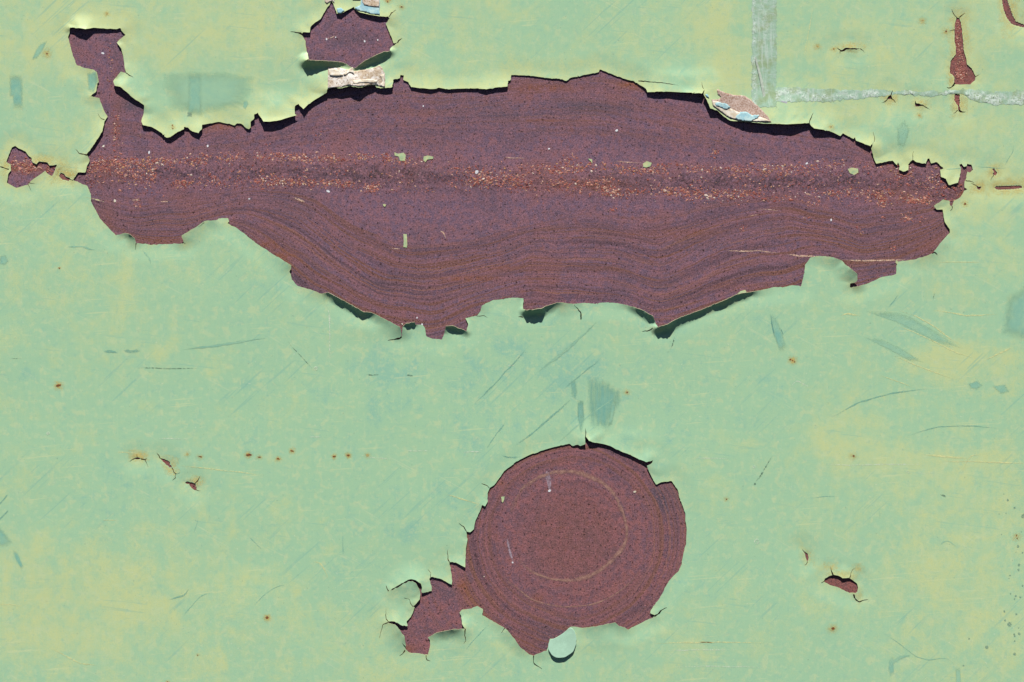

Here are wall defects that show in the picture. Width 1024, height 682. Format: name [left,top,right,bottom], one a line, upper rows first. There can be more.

peeling [0,0,1024,357]
peeling [128,450,205,494]
peeling [370,418,704,672]
peeling [797,544,868,605]